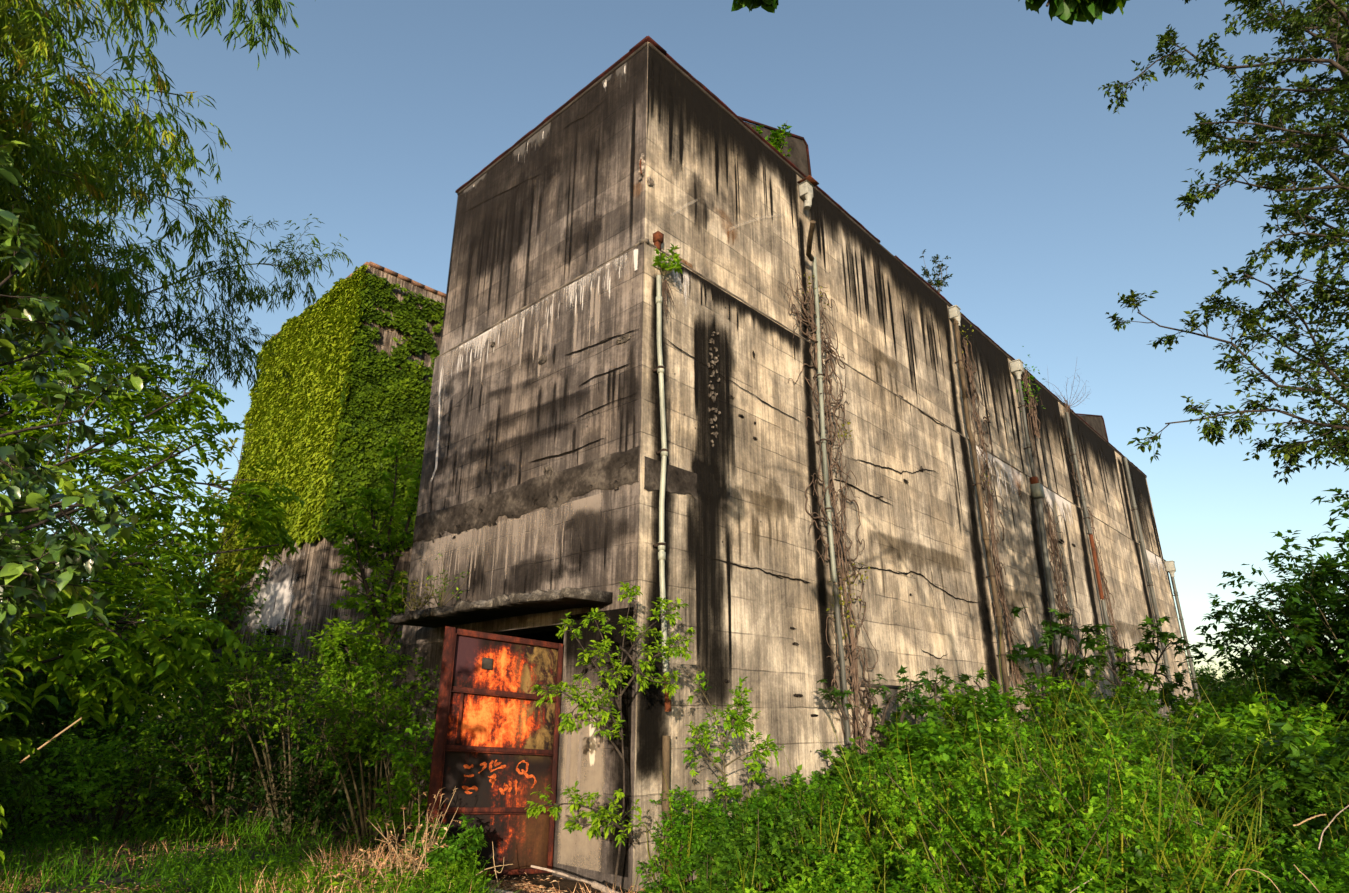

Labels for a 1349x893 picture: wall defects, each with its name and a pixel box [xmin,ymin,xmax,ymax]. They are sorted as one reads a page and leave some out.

damp [419,43,1172,779]
crack [711,558,810,583]
crack [850,565,978,608]